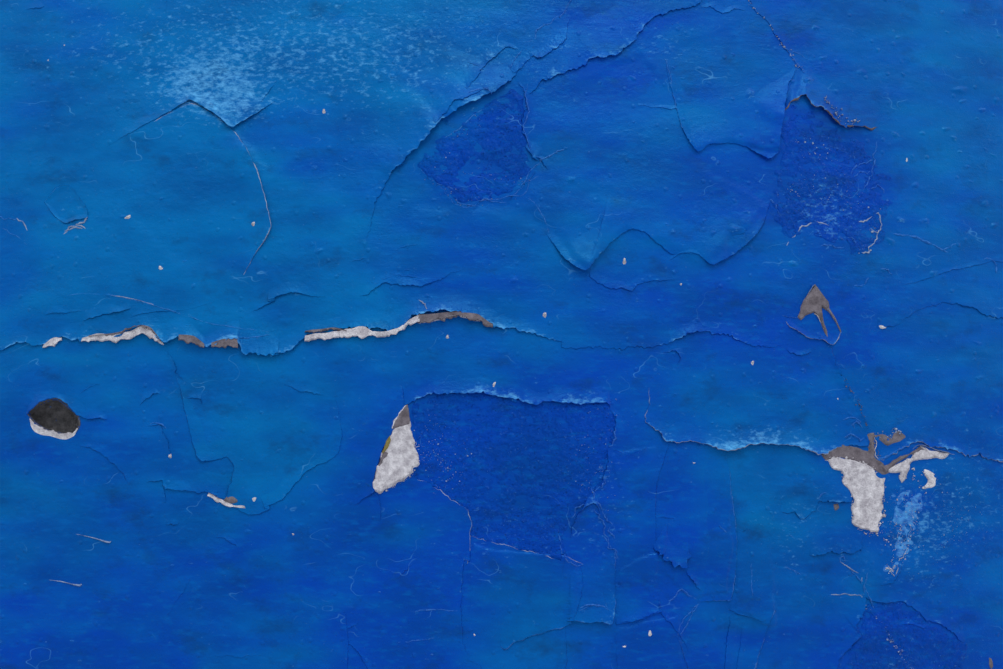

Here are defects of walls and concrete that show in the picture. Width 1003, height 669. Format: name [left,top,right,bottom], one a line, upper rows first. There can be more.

peeling [342,0,746,243]
peeling [771,67,893,256]
spalling [26,390,108,439]
crack [0,289,782,406]
peeling [353,376,616,577]
crack [558,405,703,590]
peeling [645,387,950,546]
spalling [786,285,841,356]
crack [831,556,874,608]